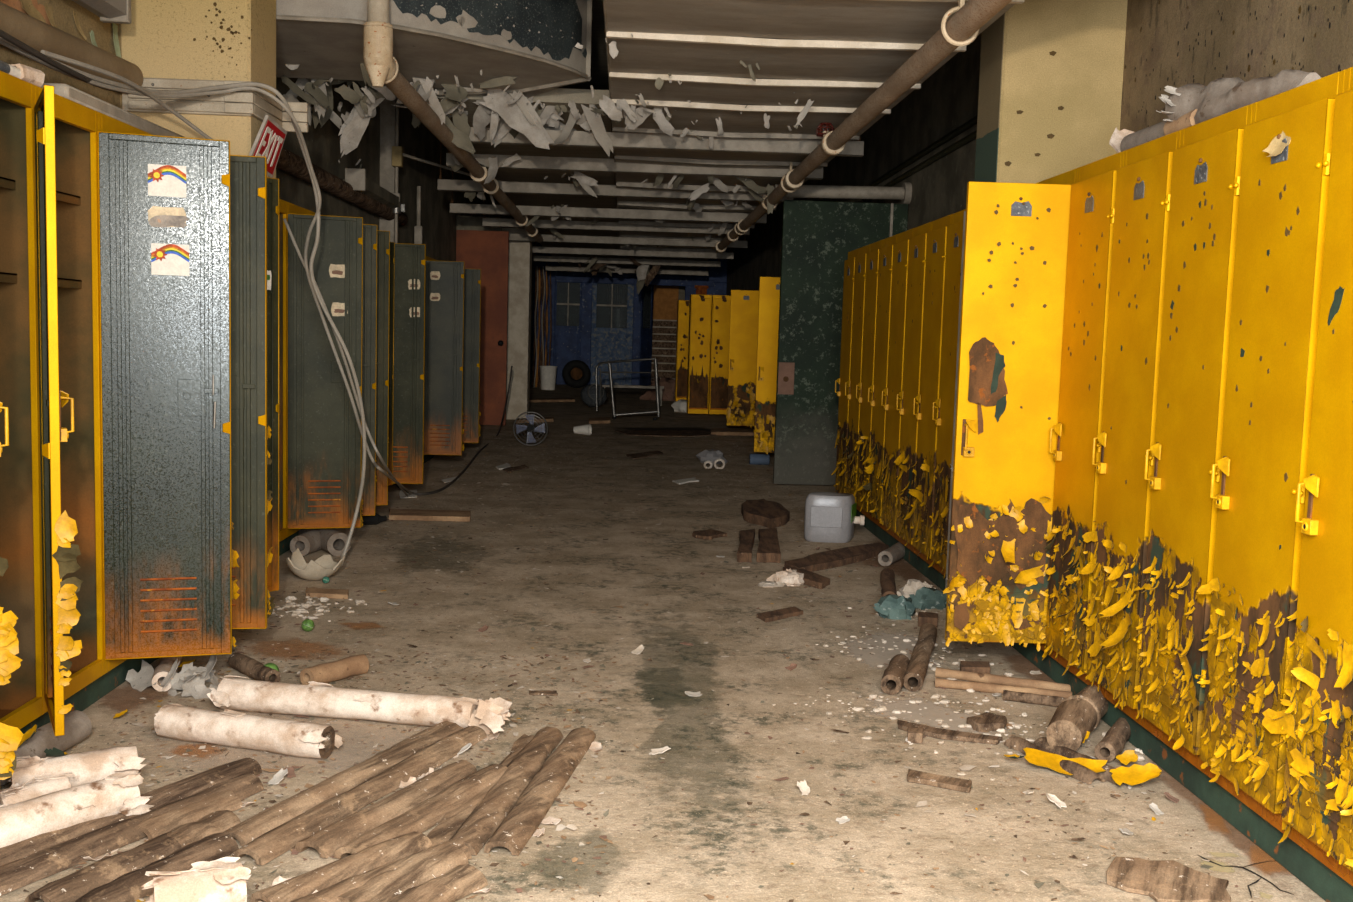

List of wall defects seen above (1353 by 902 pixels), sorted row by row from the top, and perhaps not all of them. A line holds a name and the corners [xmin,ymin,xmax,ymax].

peeling [393,0,587,61]
peeling [605,38,619,59]
peeling [1177,6,1314,77]
peeling [280,63,422,169]
peeling [410,70,724,207]
peeling [764,92,814,140]
peeling [641,174,774,214]
peeling [578,244,661,294]